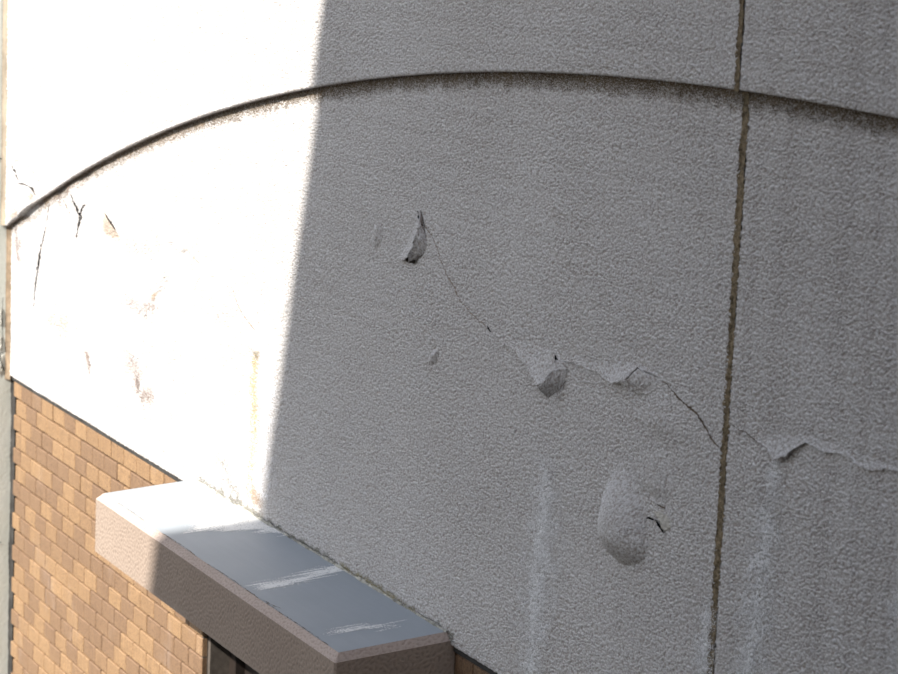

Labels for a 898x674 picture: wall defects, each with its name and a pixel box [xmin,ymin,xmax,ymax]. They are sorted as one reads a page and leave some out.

crack [11,164,115,307]
peeling [396,210,427,264]
peeling [501,337,666,399]
leakage [212,343,283,513]
peeling [755,431,898,472]